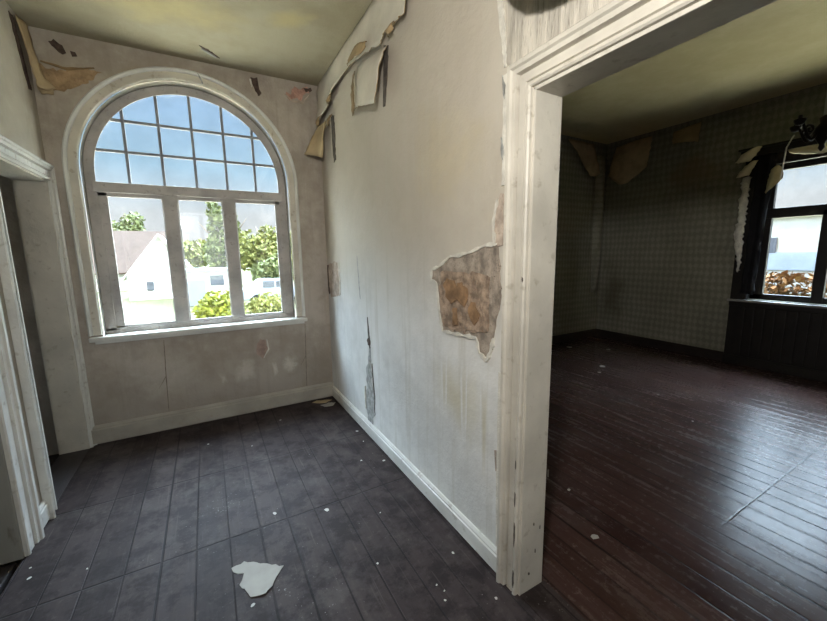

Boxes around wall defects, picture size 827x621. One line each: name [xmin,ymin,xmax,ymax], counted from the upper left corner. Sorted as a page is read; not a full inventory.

flaking render [48,39,77,57]
flaking render [37,60,102,95]
peeling [347,41,367,116]
flaking render [430,0,613,362]